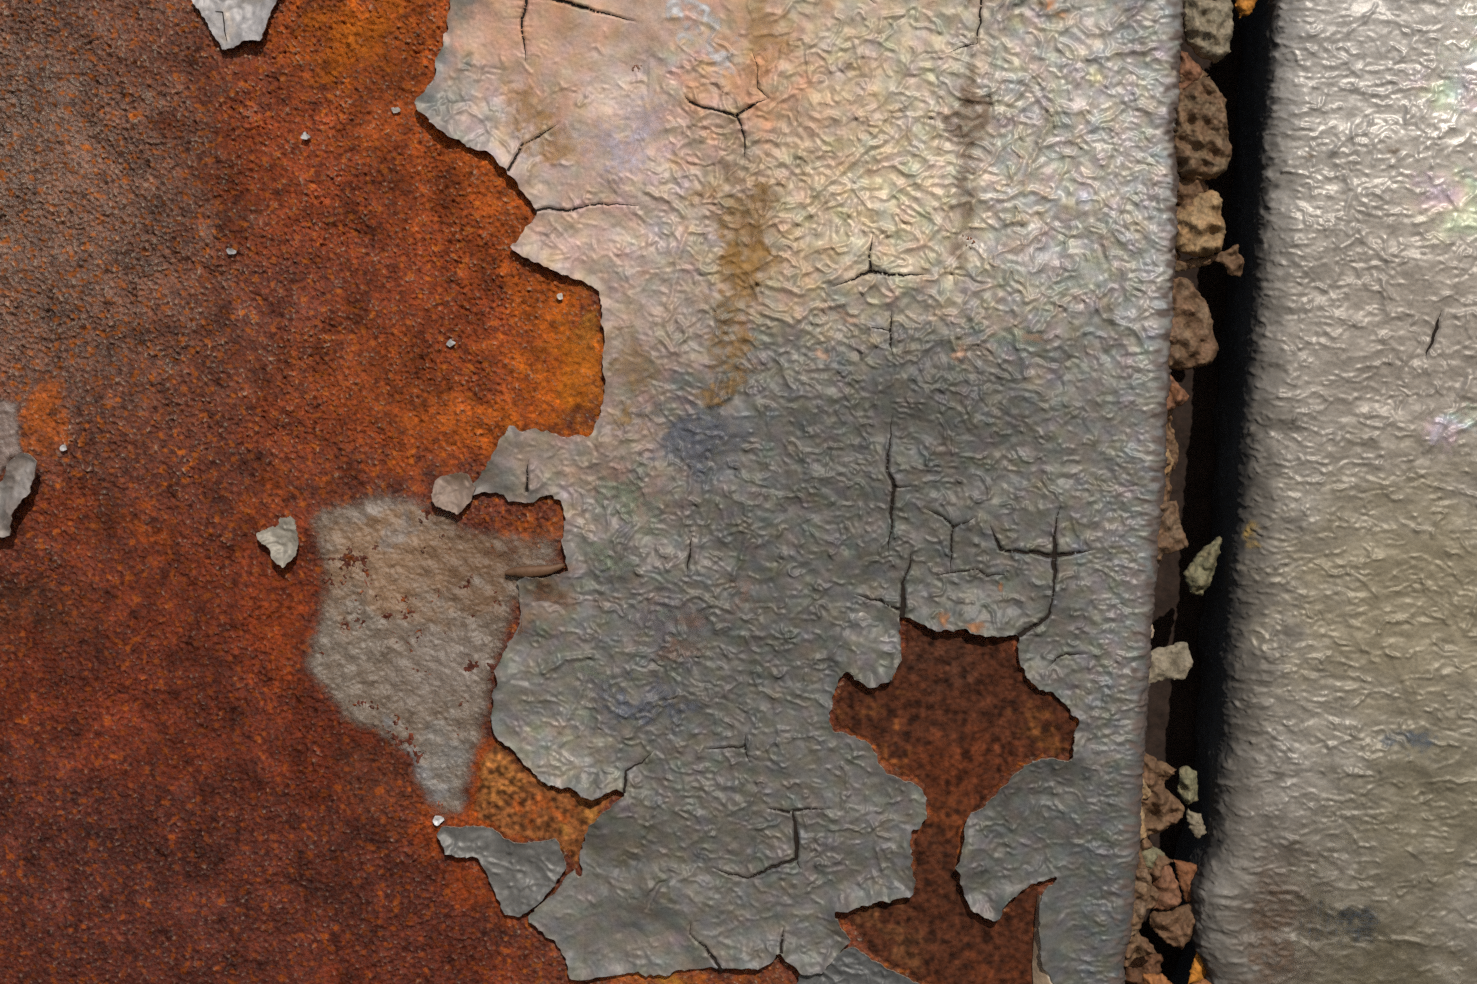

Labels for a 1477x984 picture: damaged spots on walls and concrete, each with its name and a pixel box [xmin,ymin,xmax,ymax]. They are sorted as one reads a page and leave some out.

peeling [192,0,277,50]
crack [521,0,633,62]
crack [685,52,766,157]
crack [833,236,922,287]
corrosion [1157,0,1257,596]
peeling [0,401,37,537]
peeling [308,0,1187,984]
crack [855,419,1091,638]
peeling [1171,0,1477,984]
corrosion [968,623,984,633]
corrosion [1148,625,1193,684]
corrosion [1124,753,1211,984]